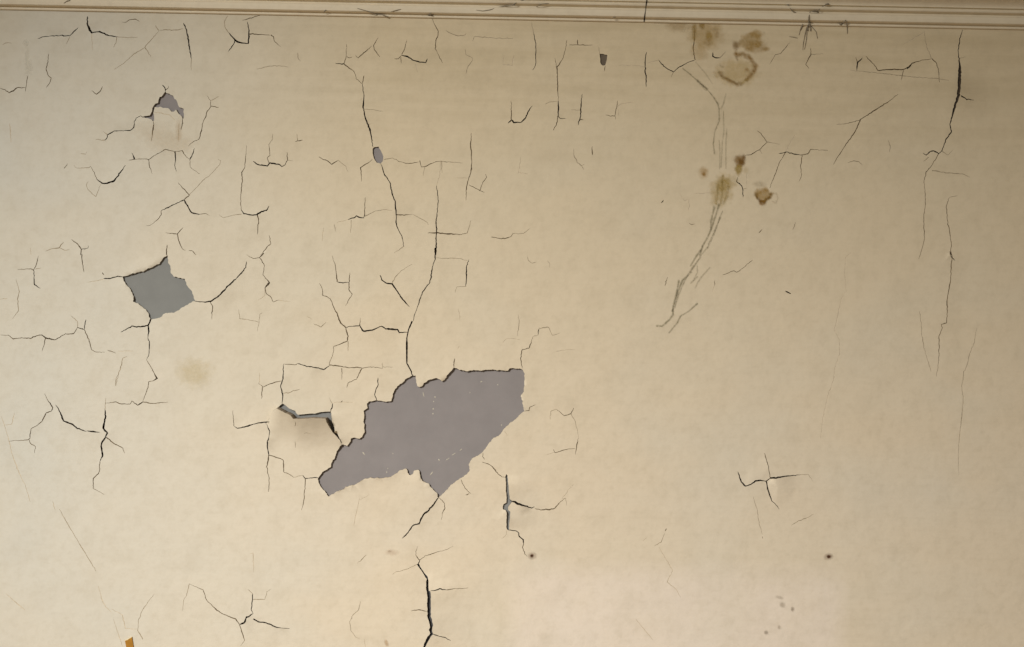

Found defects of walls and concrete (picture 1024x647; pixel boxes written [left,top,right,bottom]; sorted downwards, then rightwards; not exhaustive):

crack [0,16,192,95]
peeling [144,92,184,121]
peeling [373,147,383,163]
crack [736,30,971,376]
peeling [123,256,195,319]
crack [64,15,723,510]
crack [2,239,167,644]
peeling [318,368,525,497]
crack [482,456,573,555]
crack [738,453,813,538]
crack [183,553,290,644]
crack [393,480,471,647]